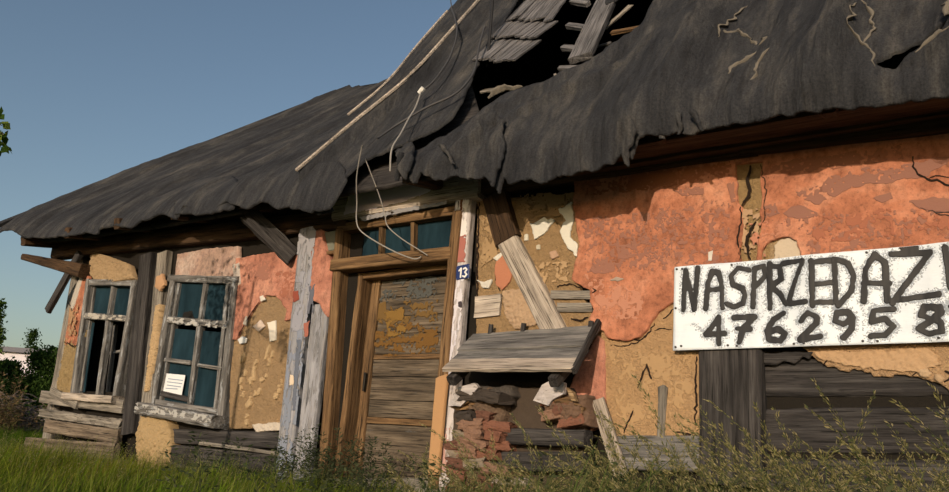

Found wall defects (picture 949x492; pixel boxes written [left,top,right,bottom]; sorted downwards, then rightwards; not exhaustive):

crack [736,164,767,260]
crack [912,156,949,186]
peeling [155,274,167,292]
spalling [456,199,539,334]
spalling [511,196,592,327]
spalling [57,313,125,393]
peeling [134,403,211,422]
peeling [144,304,228,392]
spalling [229,229,316,480]
peeling [428,279,464,475]
spalling [591,304,703,436]
peeling [803,342,949,390]